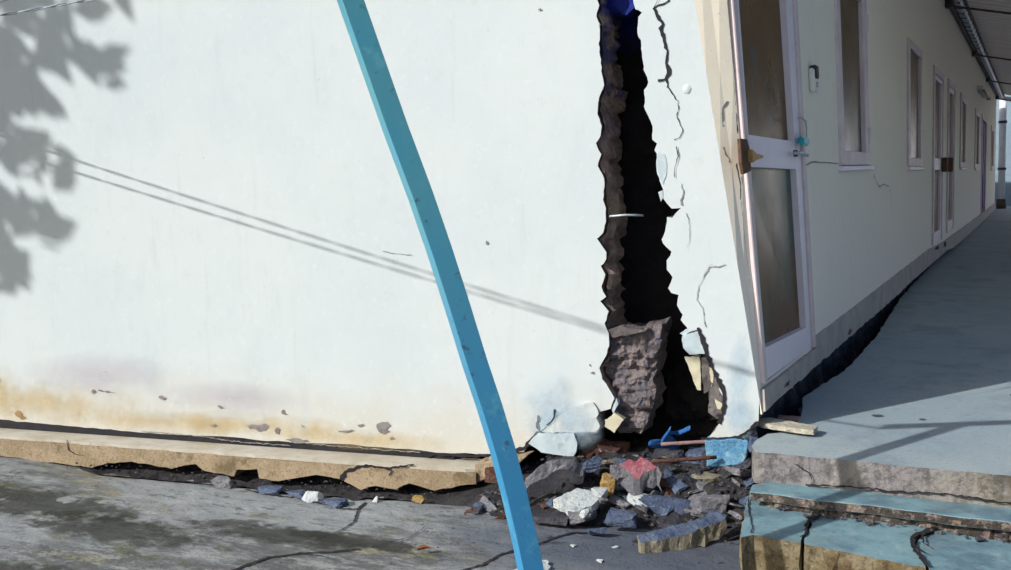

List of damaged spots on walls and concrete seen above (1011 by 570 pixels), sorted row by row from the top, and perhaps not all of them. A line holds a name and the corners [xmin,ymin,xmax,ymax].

crack [598,0,760,448]
crack [0,419,491,481]
crack [516,438,531,452]
crack [796,464,1011,504]
crack [799,512,820,537]
crack [910,527,937,565]